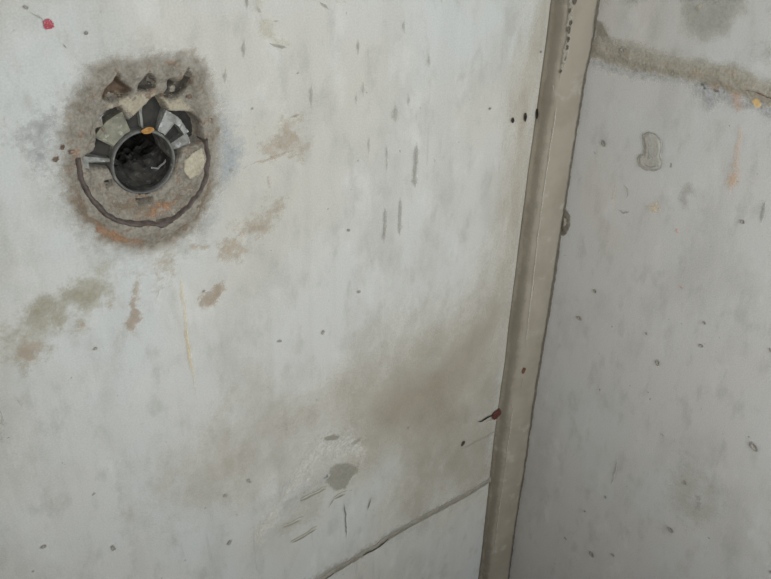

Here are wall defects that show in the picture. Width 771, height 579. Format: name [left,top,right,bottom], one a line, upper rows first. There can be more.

spalling [53,49,224,255]
leakage [343,295,509,507]